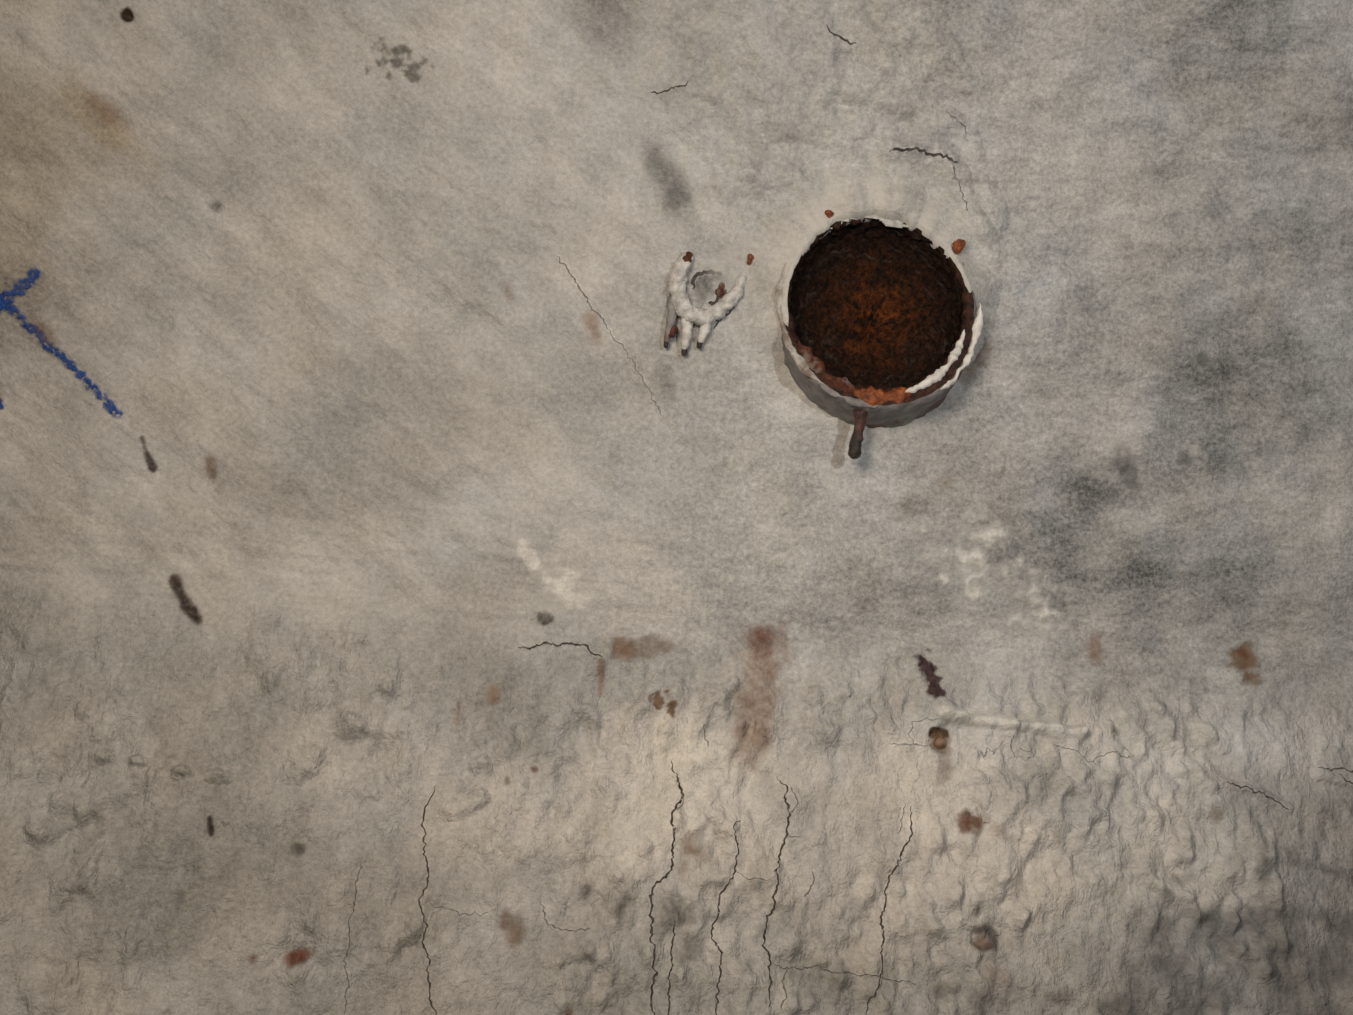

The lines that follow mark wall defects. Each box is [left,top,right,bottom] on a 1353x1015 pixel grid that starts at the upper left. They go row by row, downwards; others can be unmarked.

crack [889,109,972,221]
corrosion [952,239,966,254]
corrosion [797,340,912,406]
crack [518,640,603,658]
corrosion [918,655,946,697]
corrosion [1230,644,1257,681]
crack [1318,767,1353,786]
crack [417,785,488,1015]
crack [647,760,685,1015]
crack [709,777,916,1015]